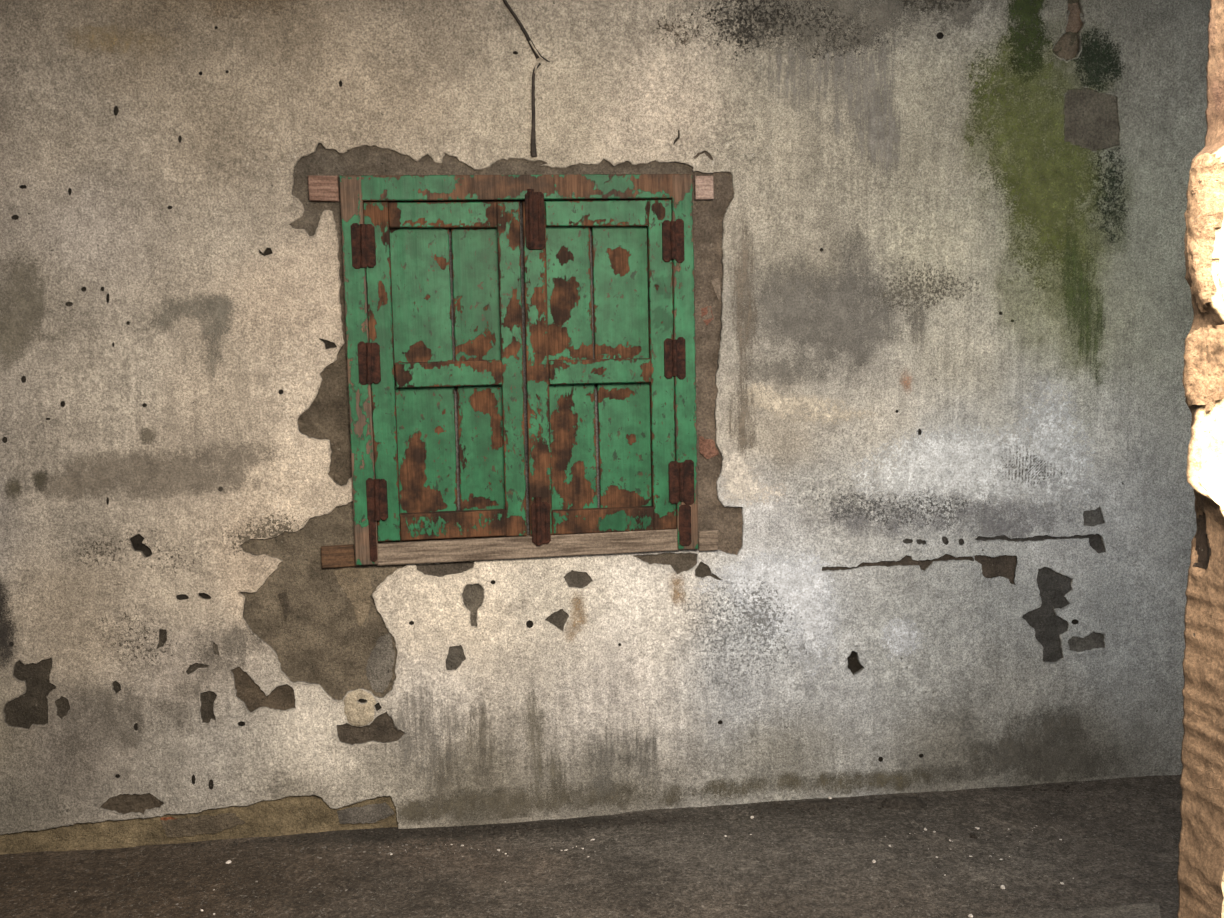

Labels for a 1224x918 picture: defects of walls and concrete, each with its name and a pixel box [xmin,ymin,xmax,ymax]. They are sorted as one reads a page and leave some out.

peeling [1051,0,1085,63]
leakage [657,0,999,174]
flaking render [1183,152,1224,510]
flaking render [229,141,745,747]
flaking render [1082,506,1106,527]
leakage [0,582,14,666]
flaking render [2,642,71,731]
flaking render [185,642,220,677]
flaking render [198,690,218,725]
flaking render [847,650,865,677]
flaking render [1021,565,1106,664]